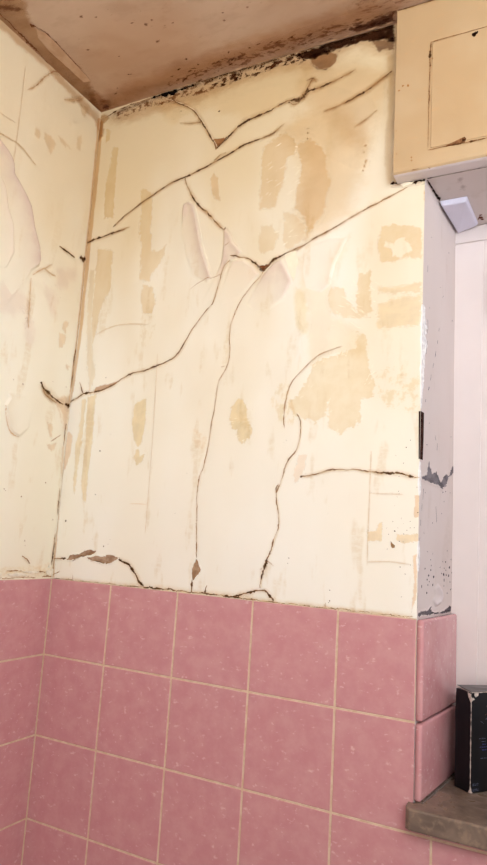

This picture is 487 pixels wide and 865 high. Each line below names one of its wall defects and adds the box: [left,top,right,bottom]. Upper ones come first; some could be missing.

damp [160,14,397,104]
crack [194,0,433,84]
crack [427,167,485,201]
peeling [377,223,432,263]
crack [28,69,420,617]
peeling [288,331,376,436]
peeling [327,269,454,518]